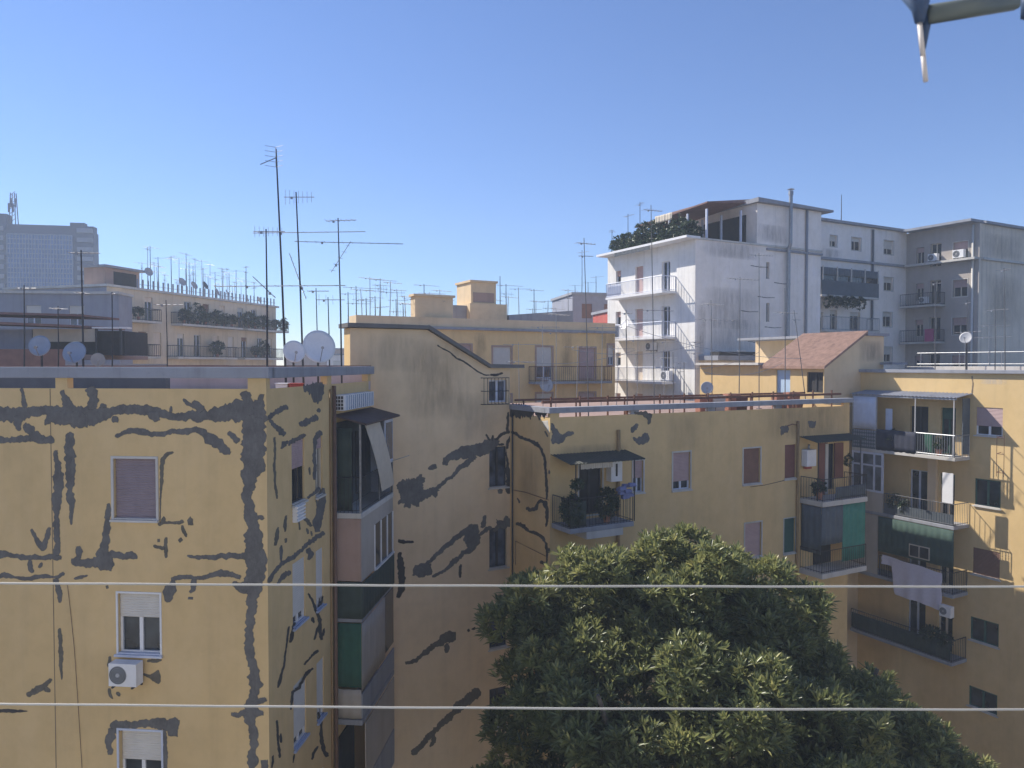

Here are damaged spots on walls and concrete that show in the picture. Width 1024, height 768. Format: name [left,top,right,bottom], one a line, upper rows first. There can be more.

crack [437,345,503,376]